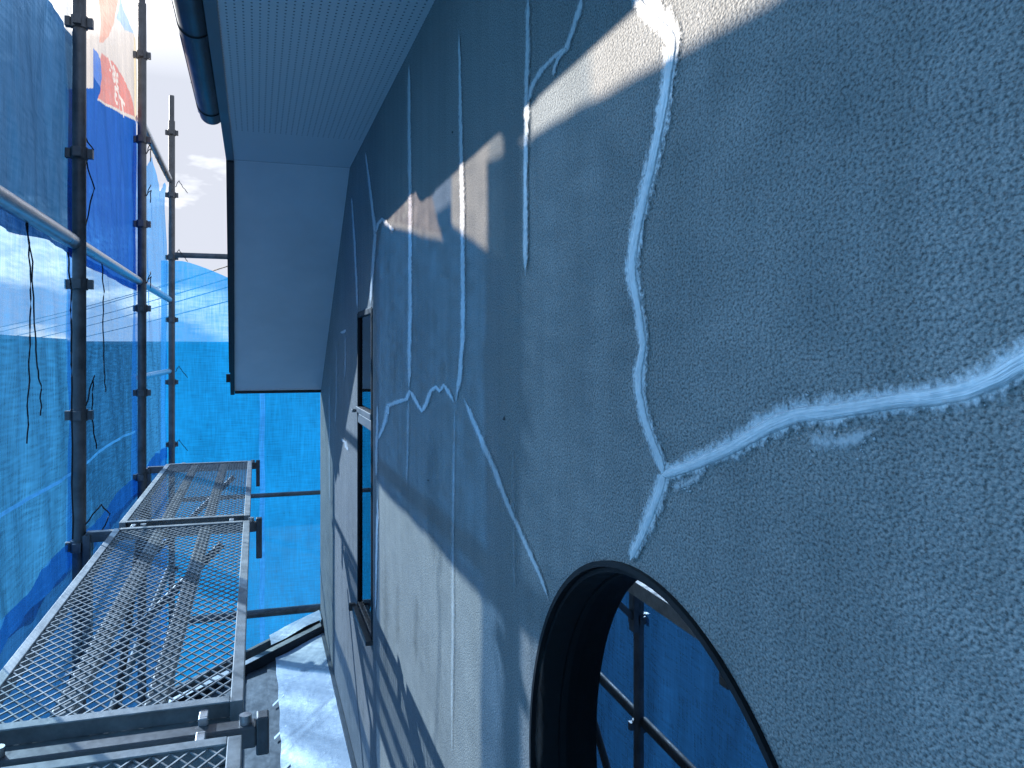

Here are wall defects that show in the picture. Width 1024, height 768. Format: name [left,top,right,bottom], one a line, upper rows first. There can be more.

crack [329,40,547,607]
crack [448,456,456,715]
crack [523,0,582,269]
crack [625,0,1024,560]